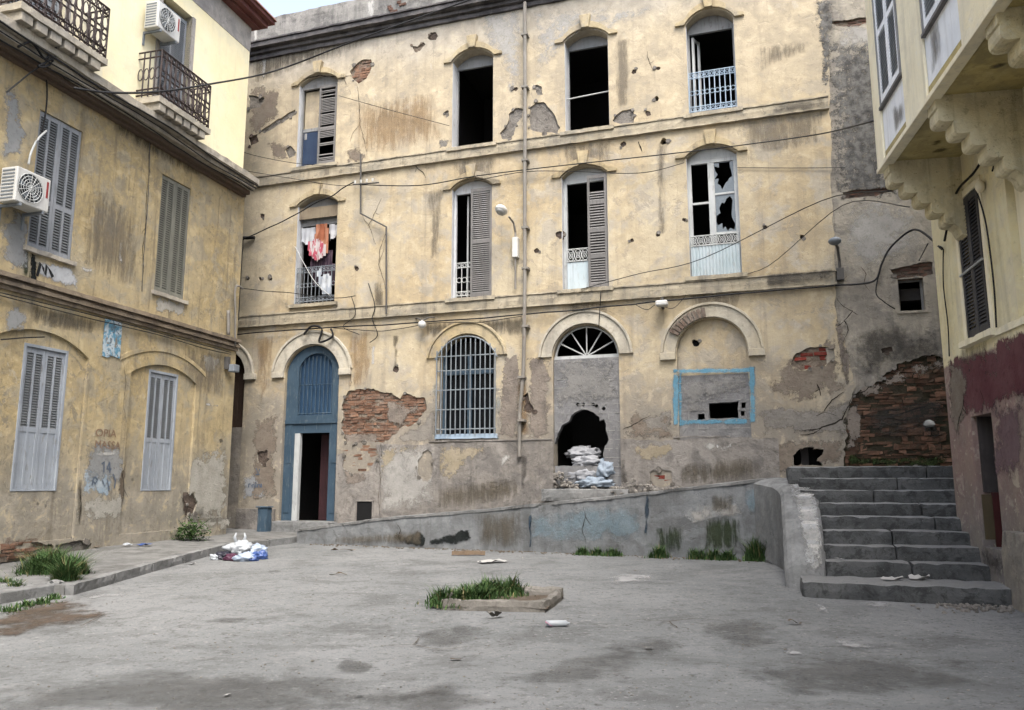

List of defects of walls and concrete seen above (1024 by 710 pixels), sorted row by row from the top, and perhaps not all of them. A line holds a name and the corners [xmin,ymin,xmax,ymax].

flaking render [351,60,375,83]
flaking render [501,85,560,140]
leakage [840,27,868,46]
flaking render [77,442,125,522]
flaking render [182,439,231,530]
flaking render [252,416,278,499]
flaking render [341,387,427,484]
flaking render [430,355,551,479]
crack [803,384,925,435]
flaking render [759,321,1024,475]